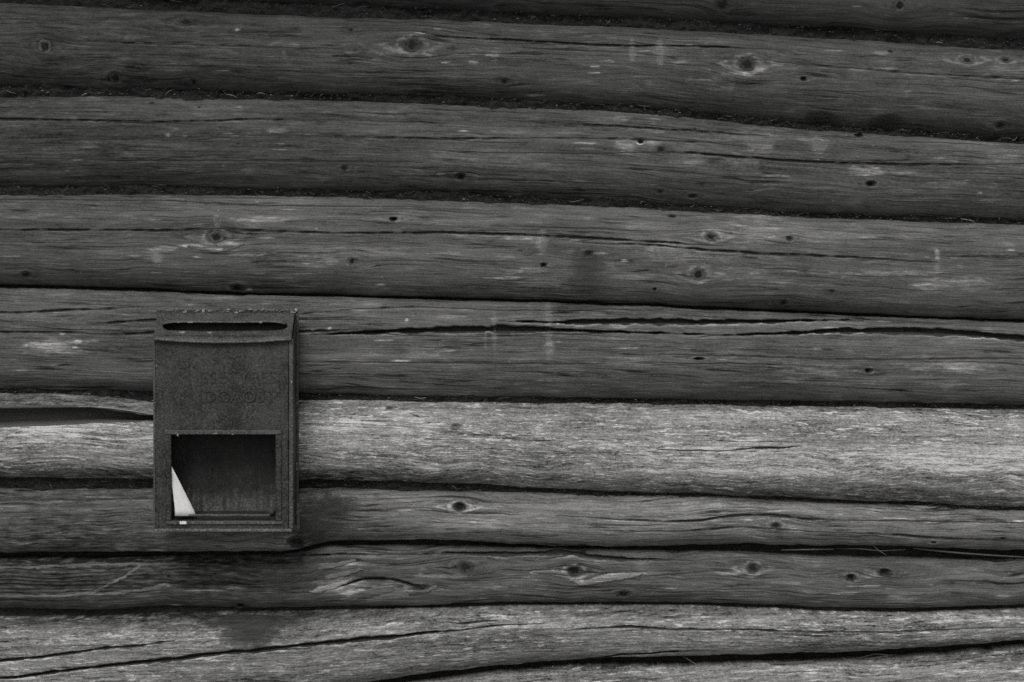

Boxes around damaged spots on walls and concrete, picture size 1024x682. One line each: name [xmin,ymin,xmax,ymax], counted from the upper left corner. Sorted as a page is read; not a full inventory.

crack [0,306,156,335]
crack [299,306,1024,360]
crack [275,548,693,588]
crack [0,620,545,679]
crack [571,625,1017,659]